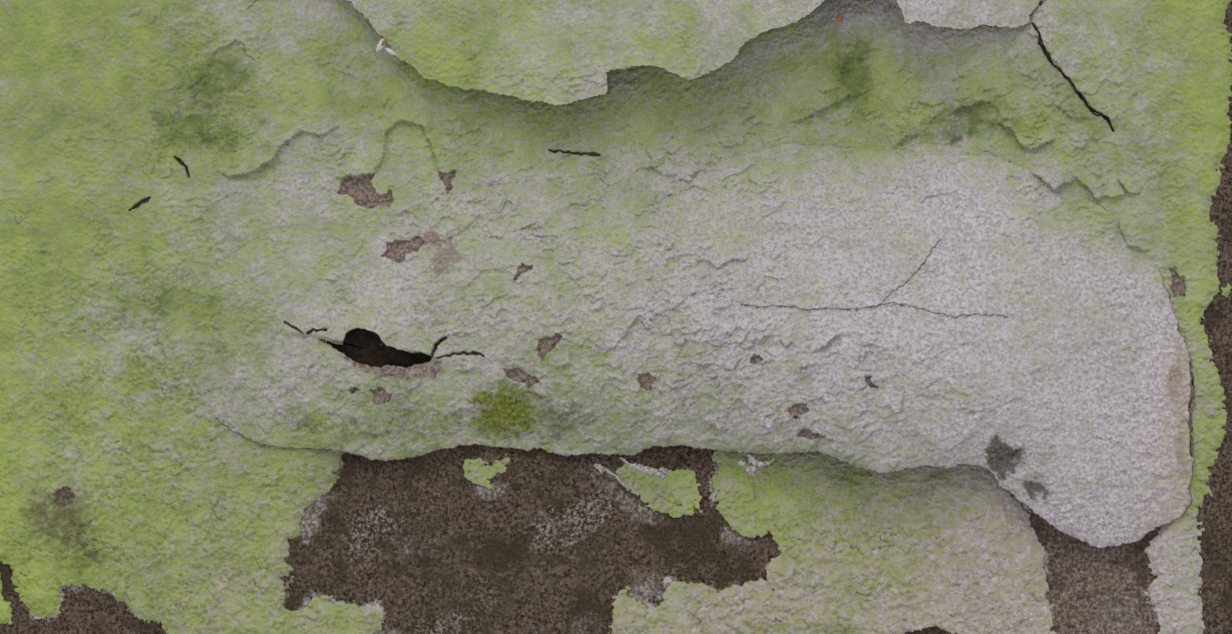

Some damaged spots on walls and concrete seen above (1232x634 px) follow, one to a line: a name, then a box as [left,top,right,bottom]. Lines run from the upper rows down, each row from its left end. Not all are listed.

crack [1030,0,1114,132]
crack [549,149,601,157]
crack [284,322,327,335]
damp [1023,480,1048,500]
damp [297,497,325,543]
spalling [279,447,779,634]
spalling [1012,494,1161,634]
spalling [904,625,957,634]